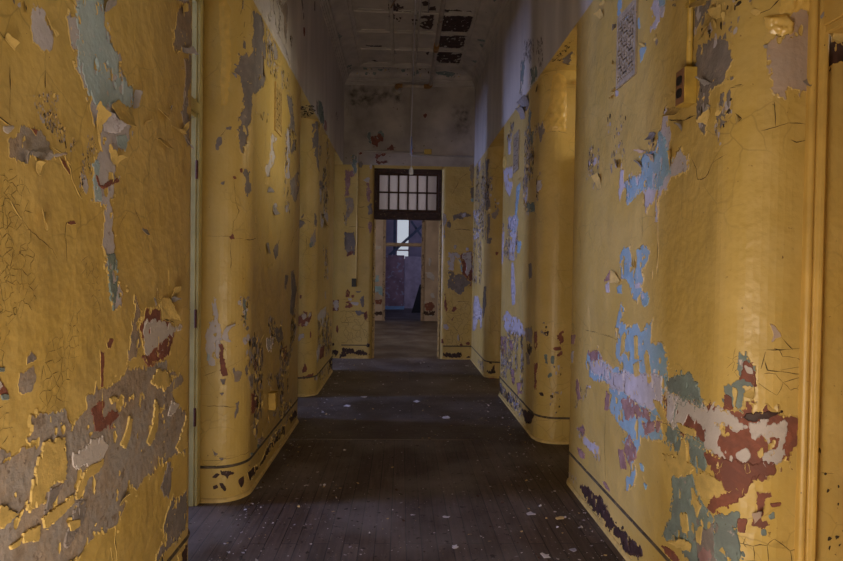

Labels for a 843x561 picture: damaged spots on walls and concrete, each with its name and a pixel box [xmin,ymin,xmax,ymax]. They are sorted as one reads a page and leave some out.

crack [1,33,20,50]
crack [0,169,101,409]
crack [54,148,82,199]
peeling [0,0,188,561]
peeling [158,0,199,149]
peeling [215,0,330,263]
peeling [205,270,383,491]
peeling [347,1,474,78]
peeling [424,38,576,424]
peeling [607,0,761,223]
peeling [573,243,799,561]
peeling [763,8,812,100]